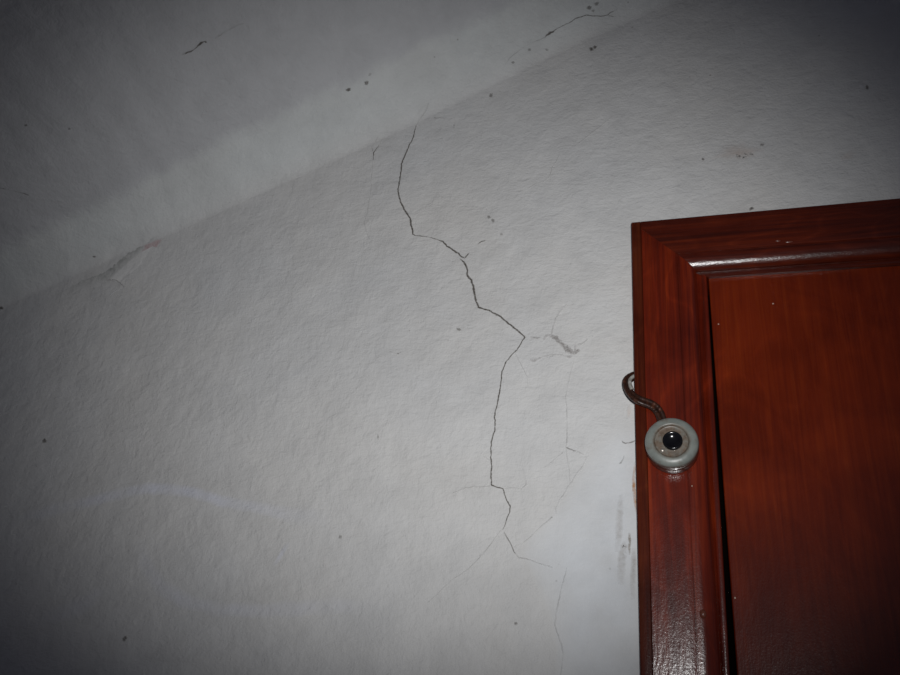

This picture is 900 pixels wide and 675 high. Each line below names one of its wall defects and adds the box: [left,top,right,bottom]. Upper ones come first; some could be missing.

crack [504,9,617,66]
crack [397,103,588,675]